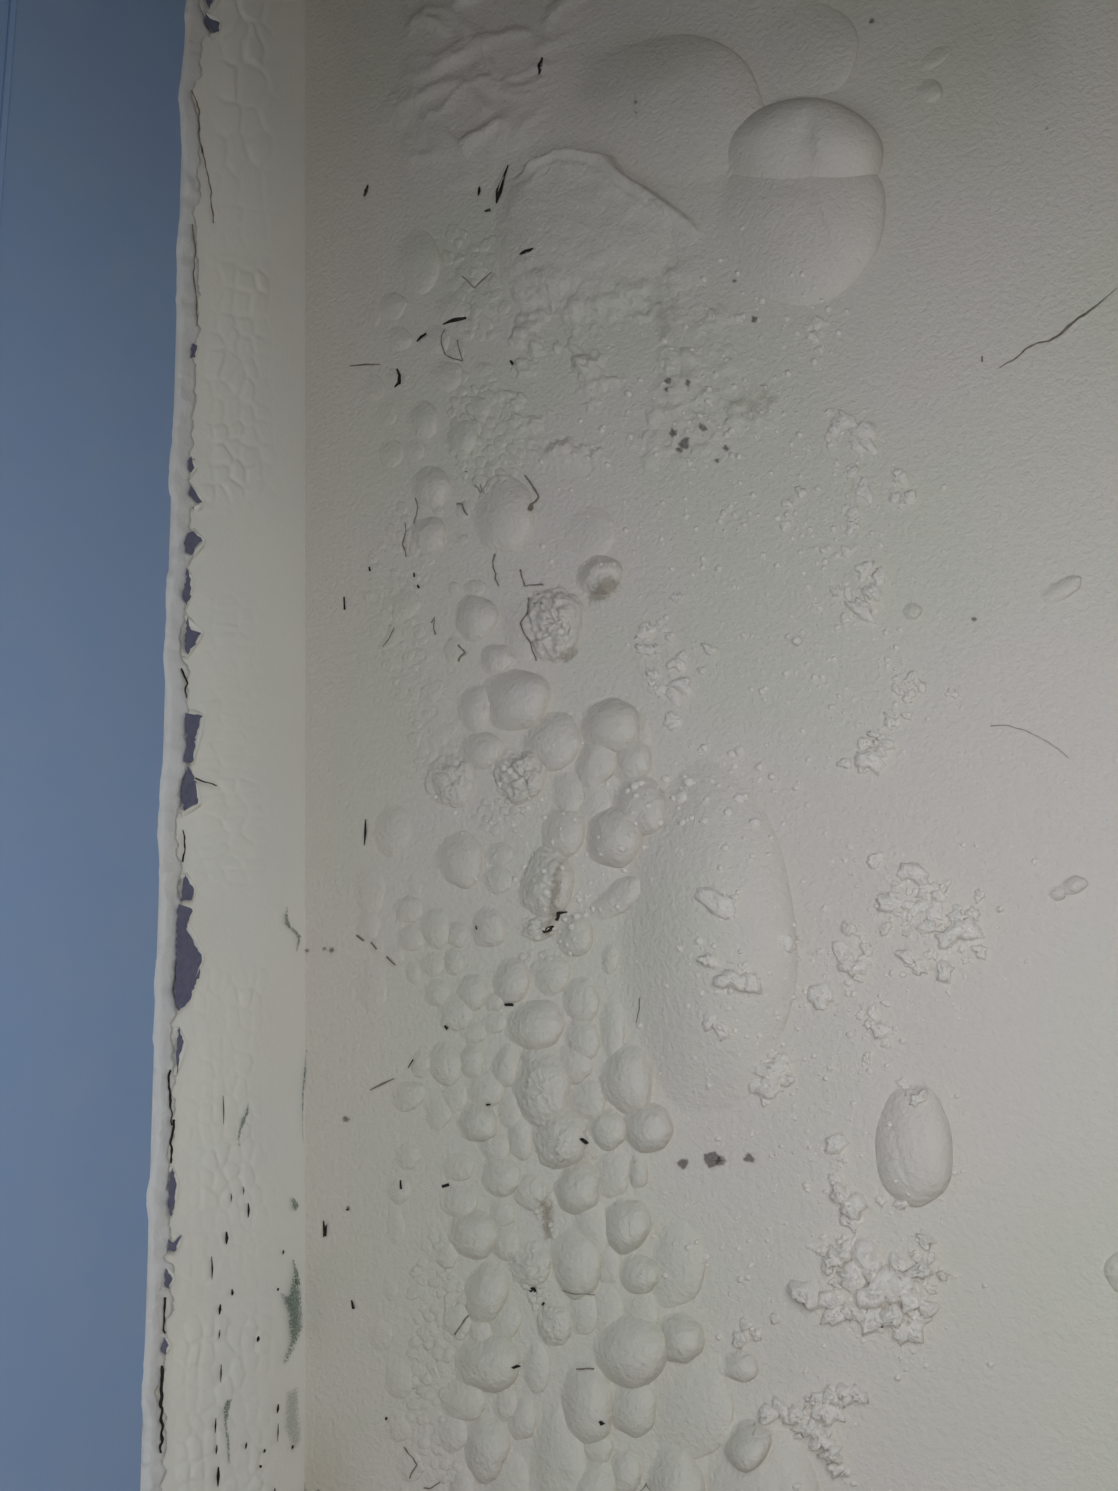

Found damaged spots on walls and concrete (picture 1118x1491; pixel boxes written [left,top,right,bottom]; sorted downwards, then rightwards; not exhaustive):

crack [191,90,214,326]
peeling [182,456,206,660]
crack [180,668,188,698]
peeling [179,708,205,817]
crack [180,830,188,862]
peeling [173,872,205,1076]
crack [167,1070,175,1163]
crack [159,1297,167,1453]